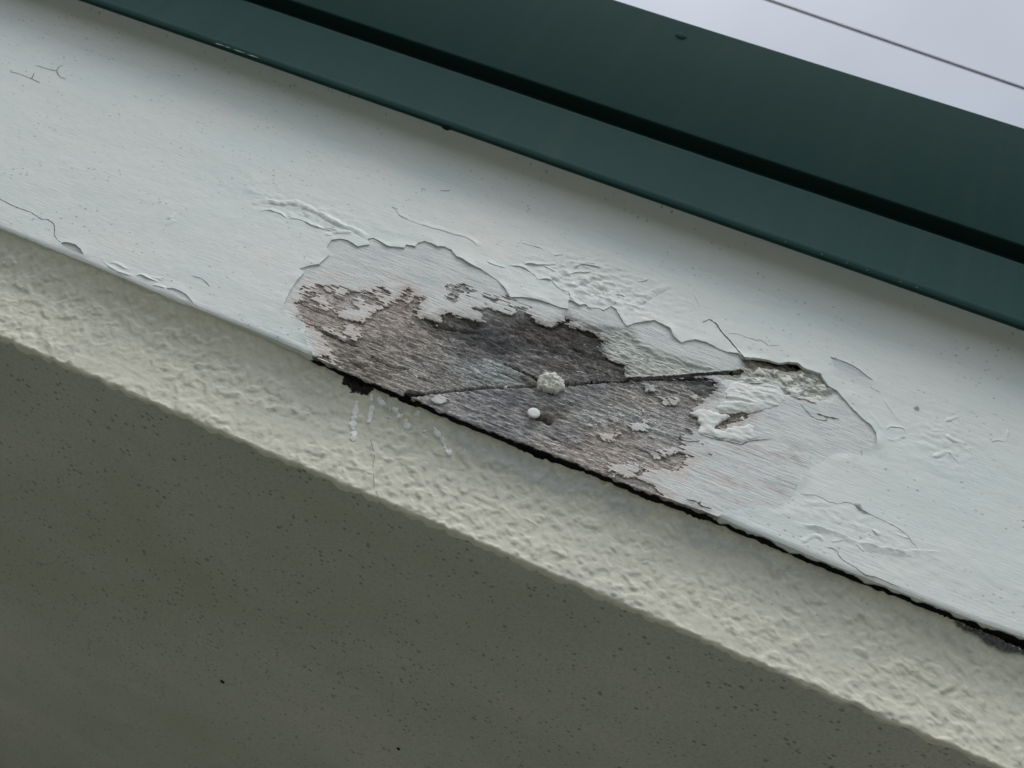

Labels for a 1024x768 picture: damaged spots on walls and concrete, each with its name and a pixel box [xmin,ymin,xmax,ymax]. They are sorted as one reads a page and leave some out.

peeling [283,238,876,521]